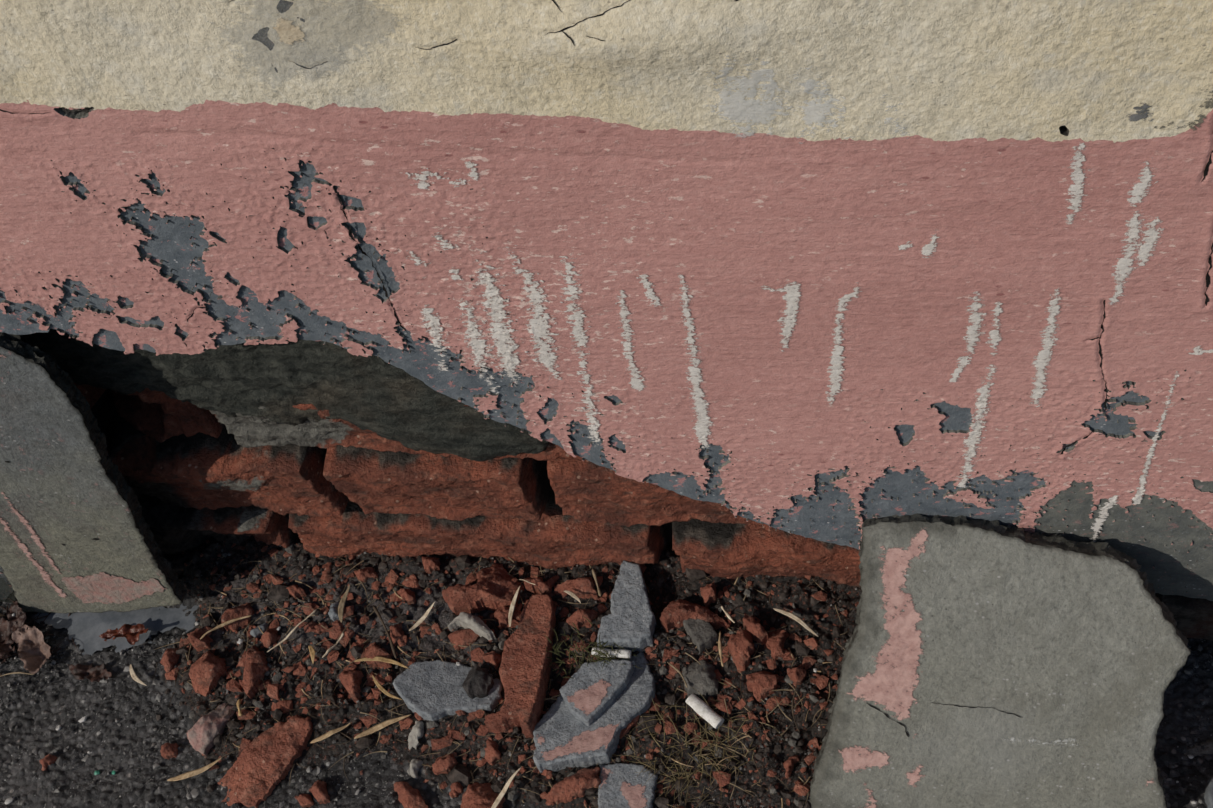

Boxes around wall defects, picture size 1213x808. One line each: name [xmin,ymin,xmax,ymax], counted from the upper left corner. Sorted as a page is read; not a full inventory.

crack [547,0,630,46]
peeling [63,172,87,198]
peeling [143,172,165,194]
peeling [288,160,400,301]
crack [336,195,408,333]
damp [421,305,450,371]
damp [449,245,601,445]
damp [949,292,1003,487]
crack [1060,300,1107,455]
damp [1109,211,1164,305]
crack [1205,243,1213,305]
flaking render [0,200,1213,720]